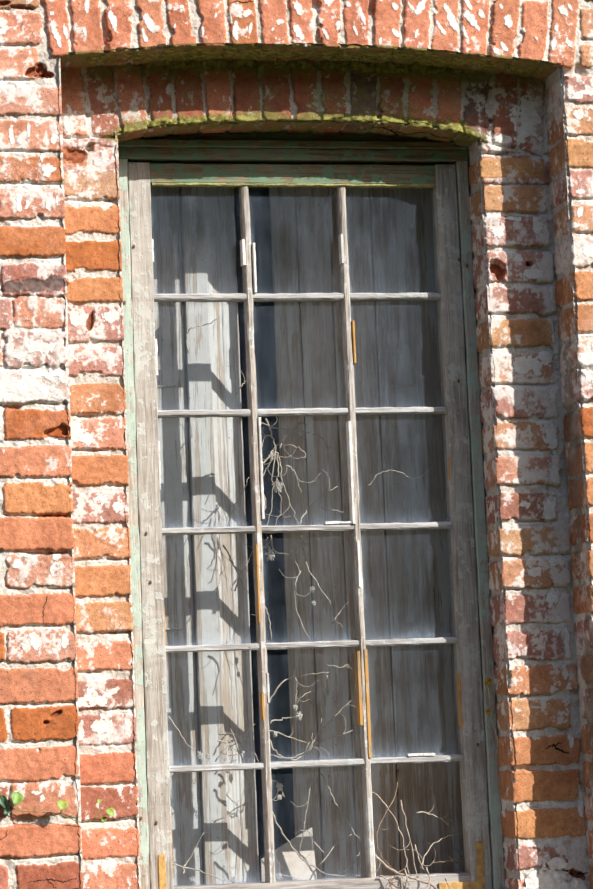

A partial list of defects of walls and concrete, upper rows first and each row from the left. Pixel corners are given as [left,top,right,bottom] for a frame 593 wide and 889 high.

spalling [26,62,54,79]
peeling [112,59,267,72]
peeling [50,104,110,167]
spalling [489,264,508,282]
peeling [513,252,545,279]
peeling [44,419,95,446]
crack [545,743,570,754]
spalling [568,868,587,889]